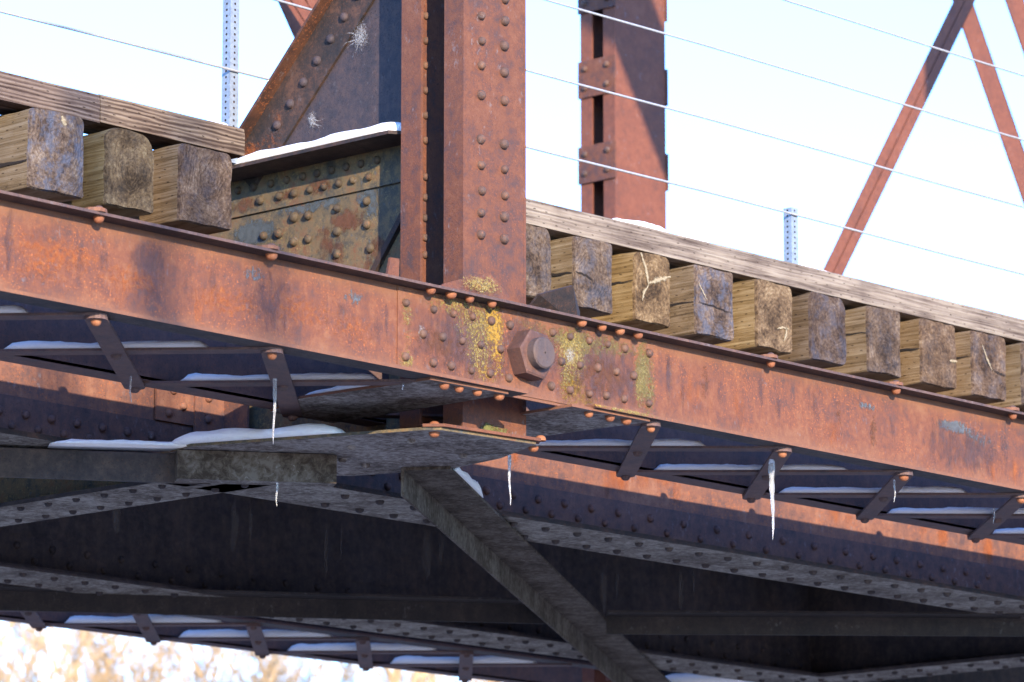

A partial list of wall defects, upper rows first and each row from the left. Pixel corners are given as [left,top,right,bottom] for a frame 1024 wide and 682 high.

peeling [938,419,992,464]